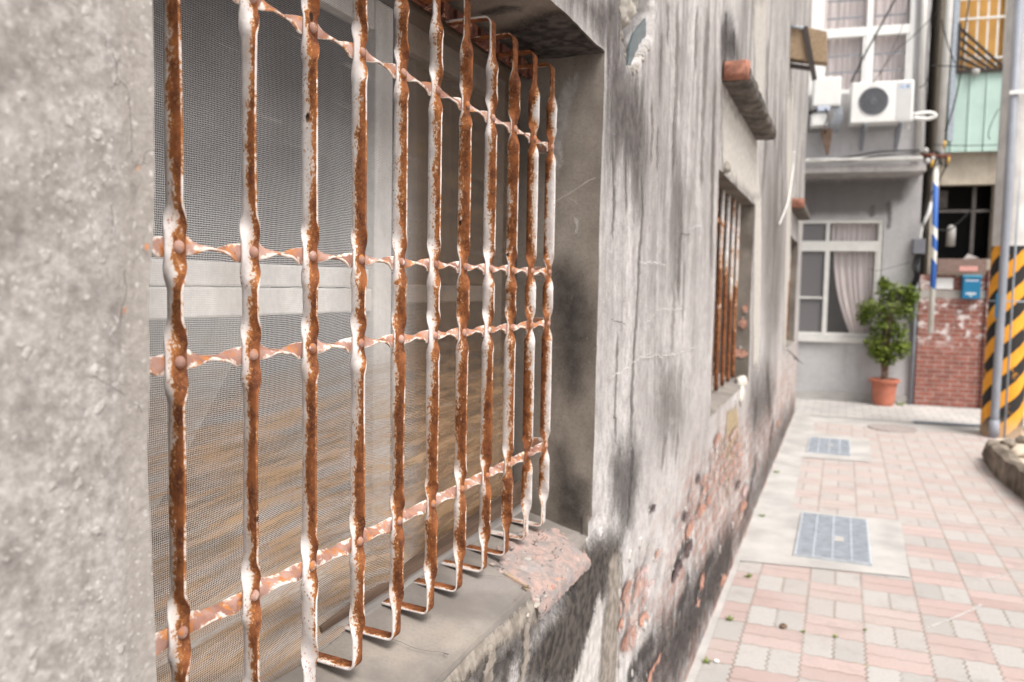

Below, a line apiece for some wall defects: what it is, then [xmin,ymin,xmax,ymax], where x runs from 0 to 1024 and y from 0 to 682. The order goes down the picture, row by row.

flaking render [619,0,650,76]
flaking render [672,427,752,582]
spalling [482,526,591,621]
flaking render [618,537,662,655]